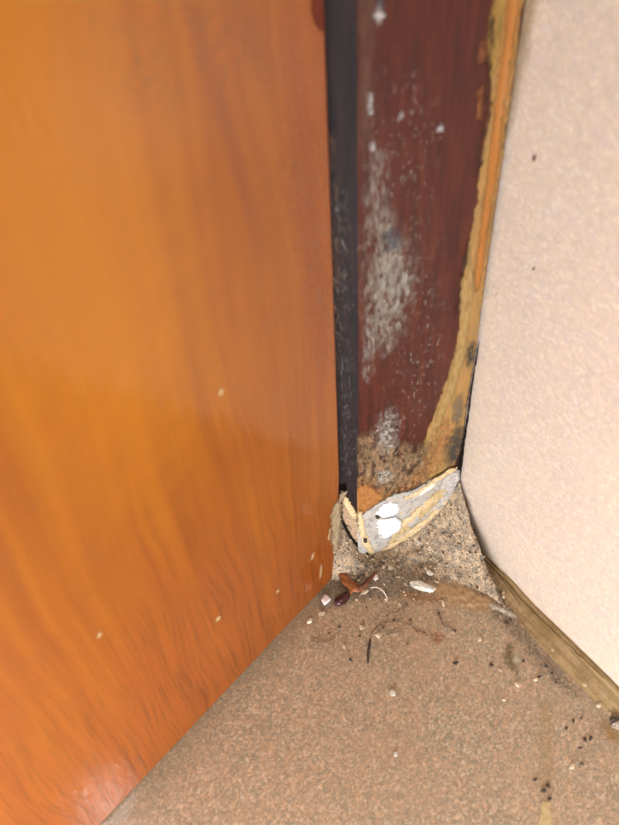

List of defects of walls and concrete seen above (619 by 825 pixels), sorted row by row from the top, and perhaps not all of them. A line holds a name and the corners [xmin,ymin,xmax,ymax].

peeling [362,0,384,38]
leakage [365,224,411,340]
peeling [420,0,524,484]
spalling [331,479,513,625]